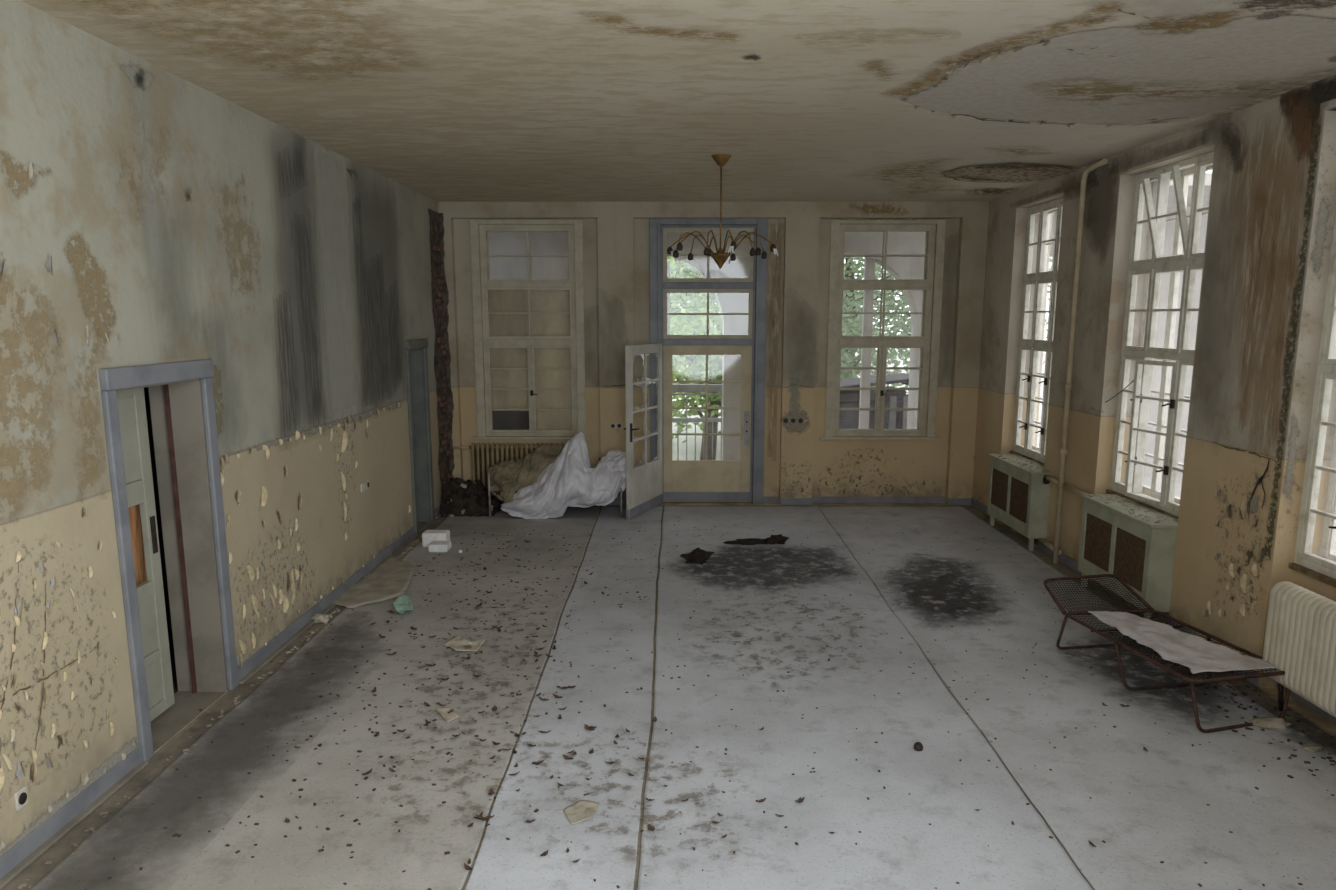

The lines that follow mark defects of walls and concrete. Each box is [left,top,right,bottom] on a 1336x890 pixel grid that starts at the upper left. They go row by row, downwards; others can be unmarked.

leakage [84,0,389,73]
leakage [588,16,737,39]
peeling [900,0,1336,128]
peeling [1,152,49,197]
peeling [0,259,60,515]
peeling [44,235,115,484]
peeling [219,399,404,541]
peeling [229,486,402,667]
peeling [0,532,138,857]